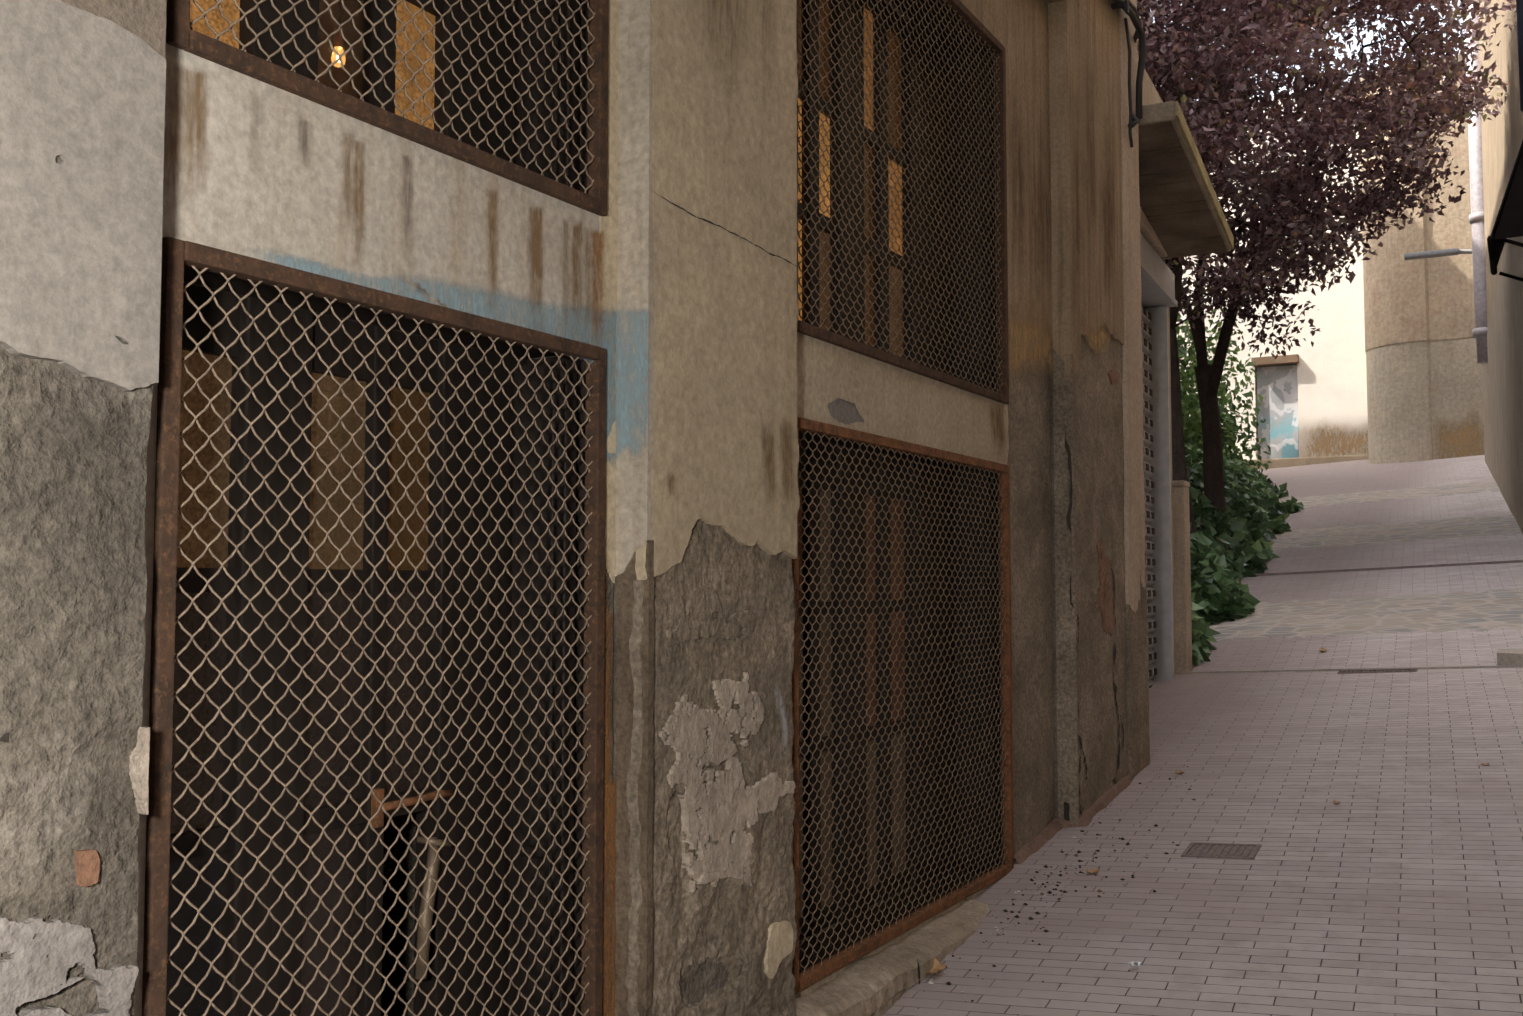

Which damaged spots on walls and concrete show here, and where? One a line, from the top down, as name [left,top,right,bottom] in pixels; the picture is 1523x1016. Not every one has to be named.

crack [654,192,796,266]
spalling [0,346,153,1016]
spalling [602,520,797,1016]
spalling [1007,325,1150,861]